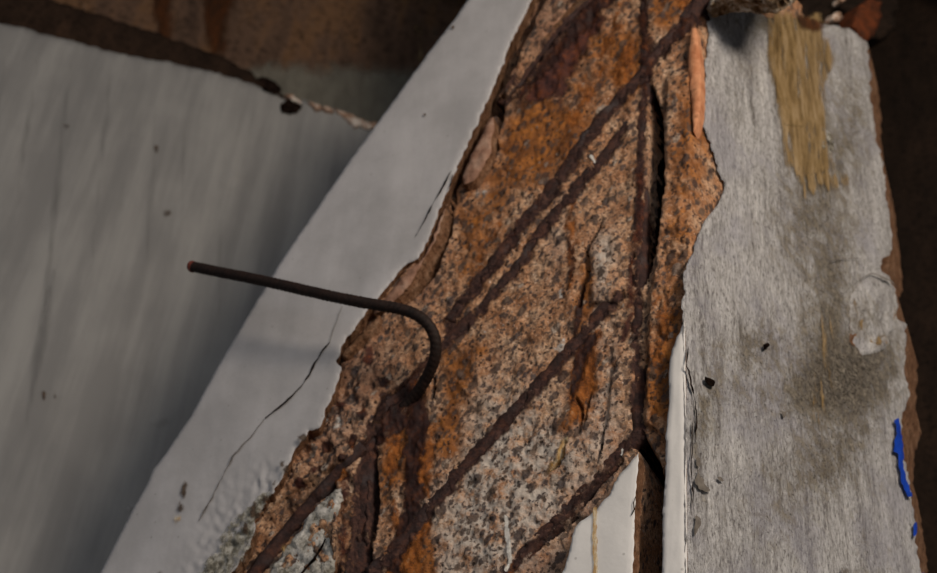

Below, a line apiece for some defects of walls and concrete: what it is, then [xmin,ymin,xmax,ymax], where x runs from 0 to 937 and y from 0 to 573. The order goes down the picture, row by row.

rust [514,0,664,130]
rust [663,0,705,57]
crack [415,171,453,237]
spalling [187,0,724,573]
rust [563,203,603,421]
rust [621,171,657,342]
crack [650,114,666,268]
crack [199,307,342,520]
rust [322,434,358,511]
rust [336,381,368,422]
rust [375,370,436,573]
crack [301,539,326,573]